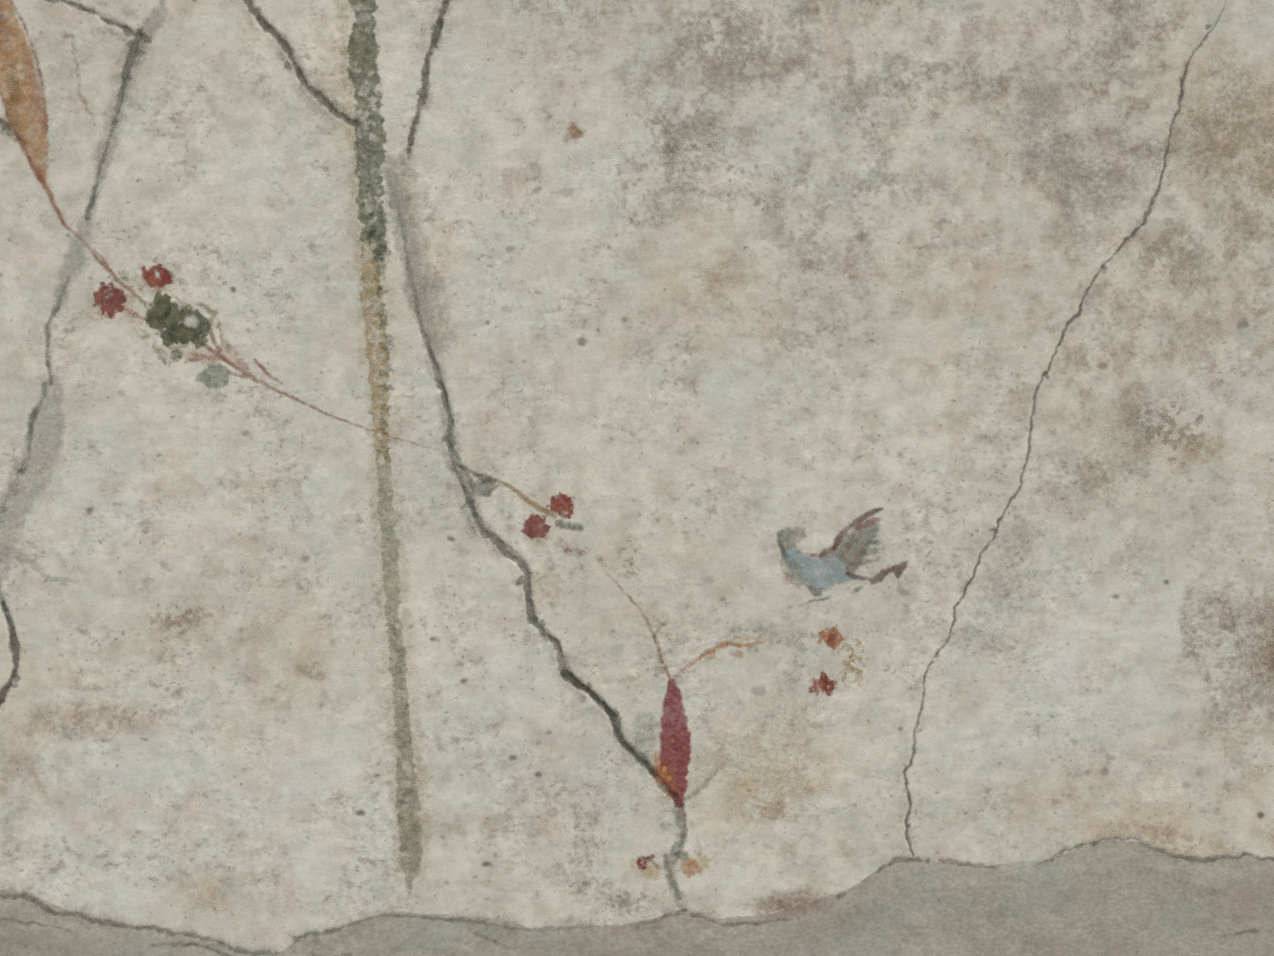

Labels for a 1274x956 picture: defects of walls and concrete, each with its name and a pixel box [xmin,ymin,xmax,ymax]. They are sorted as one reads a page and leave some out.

crack [245,0,363,139]
crack [0,0,163,703]
crack [386,0,674,798]
crack [879,24,1211,871]
crack [0,893,267,955]
crack [294,929,340,941]
crack [396,915,485,923]
crack [1060,837,1274,863]